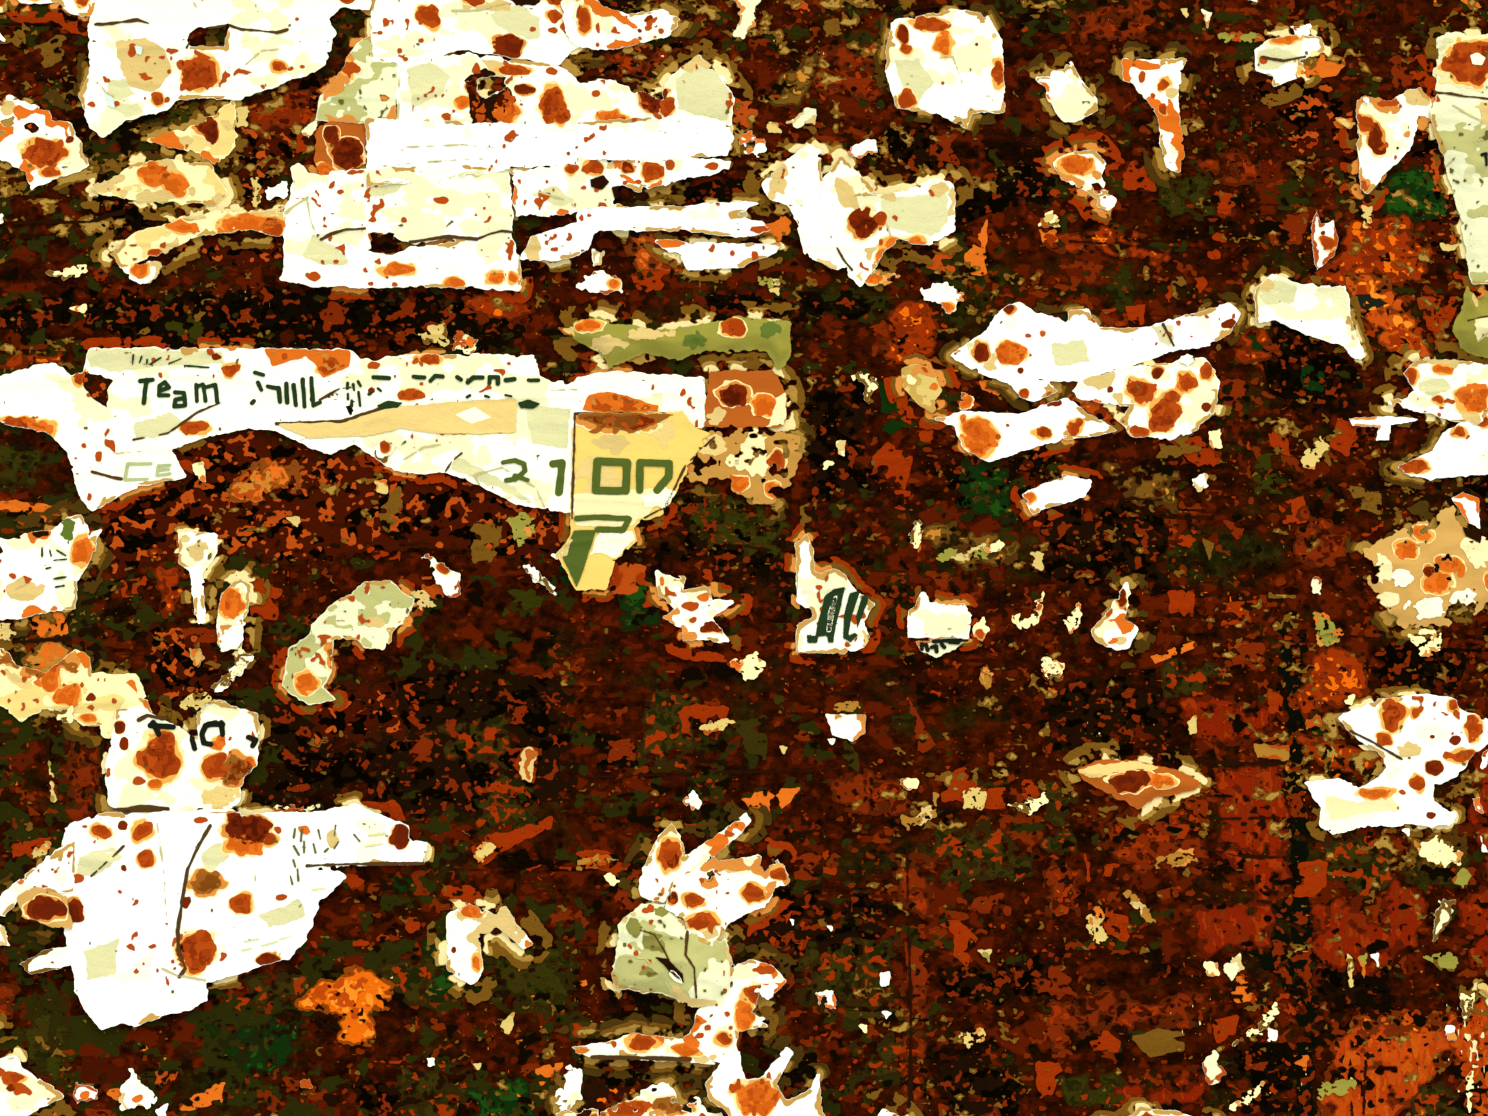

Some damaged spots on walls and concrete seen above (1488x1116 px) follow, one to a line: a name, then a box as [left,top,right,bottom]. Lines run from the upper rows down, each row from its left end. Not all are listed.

corrosion [188,27,228,45]
corrosion [320,8,371,75]
corrosion [174,98,218,116]
corrosion [234,80,328,211]
corrosion [0,174,426,370]
peeling [1343,272,1459,369]
peeling [294,964,395,1047]